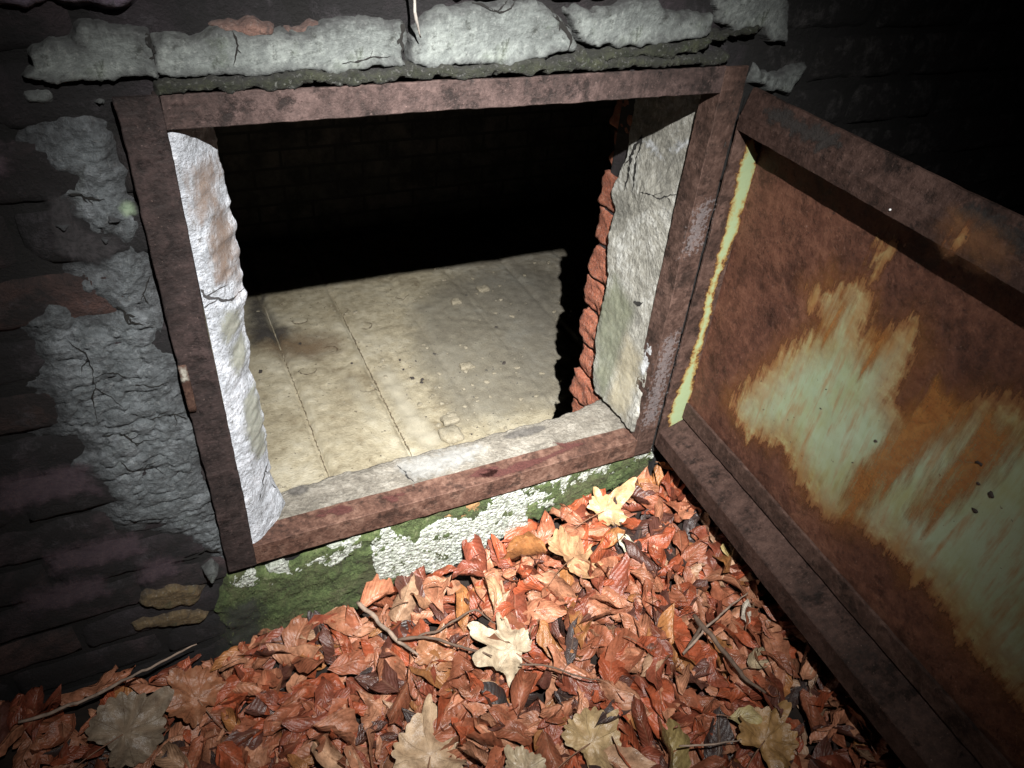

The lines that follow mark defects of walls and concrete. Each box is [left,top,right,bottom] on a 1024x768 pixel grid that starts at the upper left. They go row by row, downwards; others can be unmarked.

peeling [222,310,246,373]
crack [65,338,187,473]
rust [470,443,583,477]
rust [316,505,352,517]
flaking render [131,584,209,630]